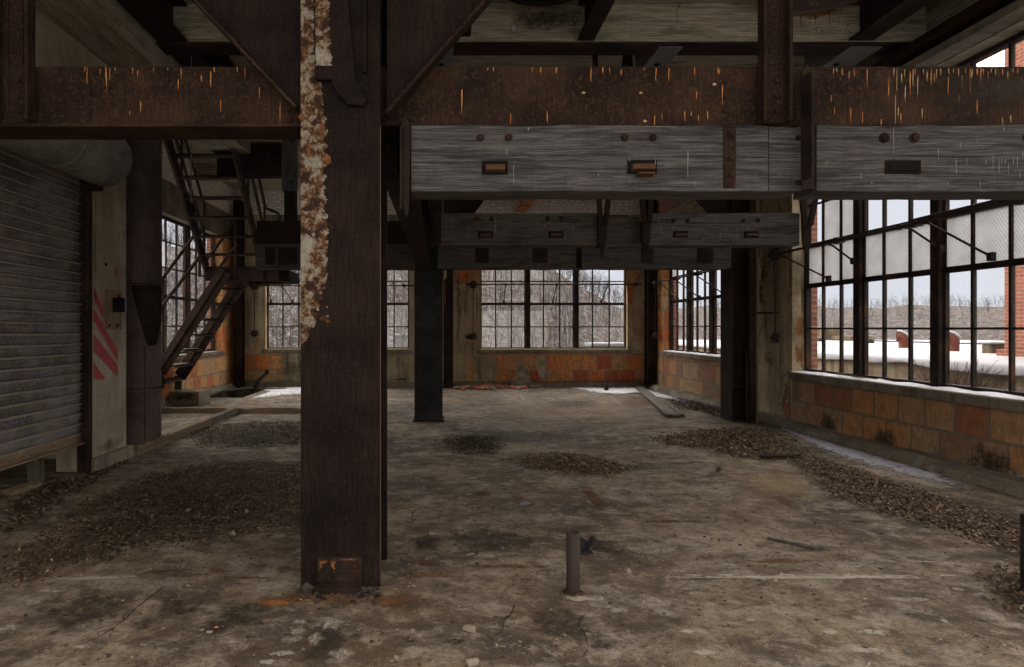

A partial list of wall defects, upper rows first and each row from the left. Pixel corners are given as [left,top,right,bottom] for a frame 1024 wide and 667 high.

peeling [298,0,333,343]
corrosion [888,68,1024,124]